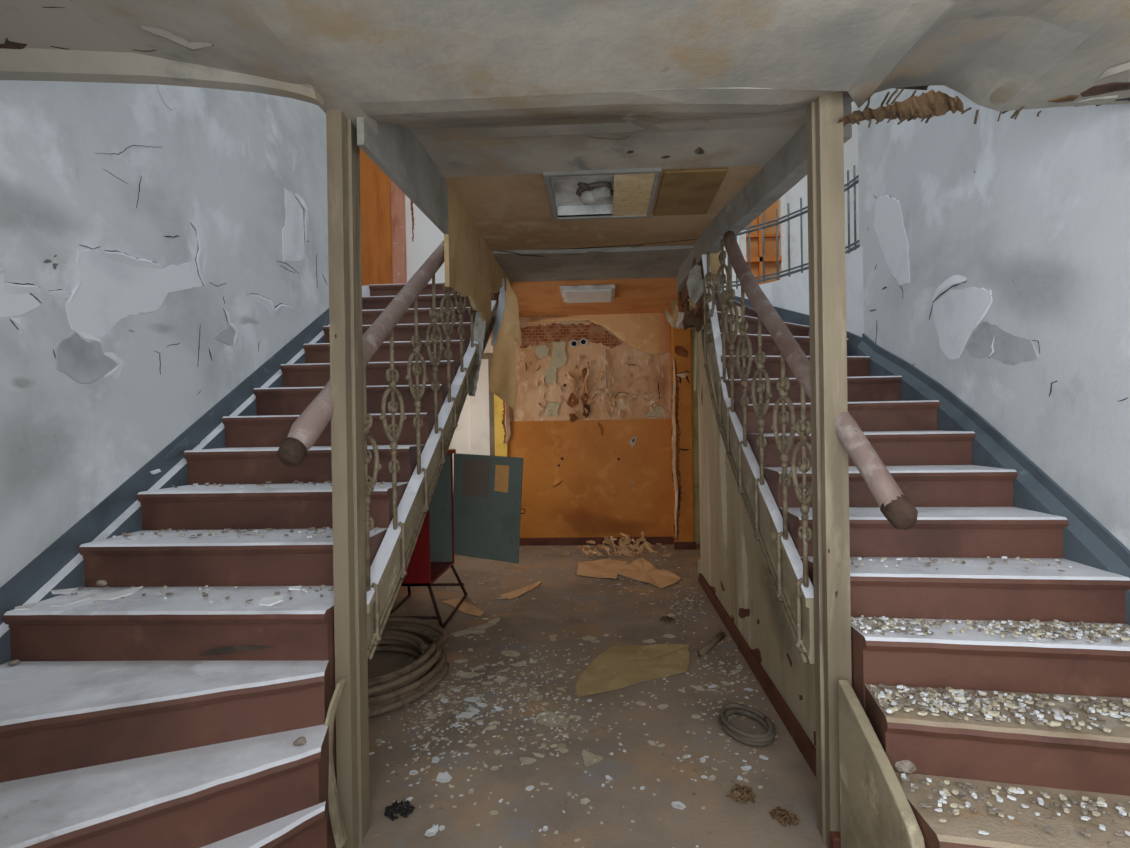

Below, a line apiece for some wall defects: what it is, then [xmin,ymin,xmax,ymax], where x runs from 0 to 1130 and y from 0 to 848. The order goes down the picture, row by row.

spalling [0,37,28,49]
flaking render [838,86,979,128]
crack [96,145,152,208]
crack [80,245,163,269]
peeling [282,188,305,262]
peeling [874,195,910,286]
peeling [0,291,41,318]
peeling [55,250,202,384]
crack [155,220,295,375]
peeling [933,287,1038,365]
flaking render [520,319,622,422]
peeling [646,346,688,540]